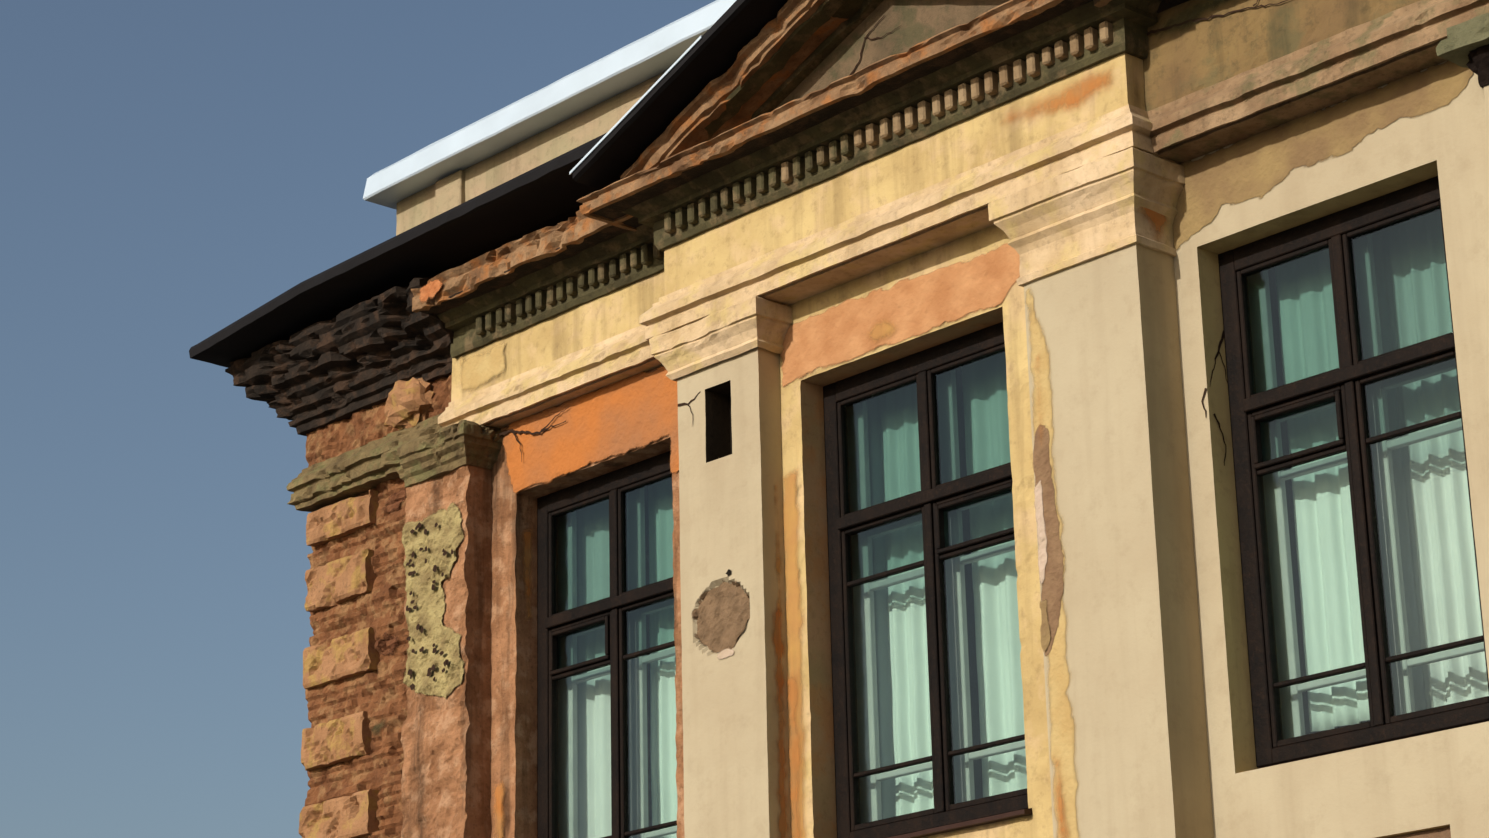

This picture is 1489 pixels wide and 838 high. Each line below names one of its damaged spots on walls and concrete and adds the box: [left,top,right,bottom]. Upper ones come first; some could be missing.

crack [849,15,900,76]
crack [1146,0,1288,35]
flaking render [1173,61,1473,250]
spalling [419,279,442,302]
crack [499,406,570,461]
crack [1201,330,1228,466]
flaking render [780,243,1079,838]
spalling [374,488,464,698]
spalling [692,569,750,659]